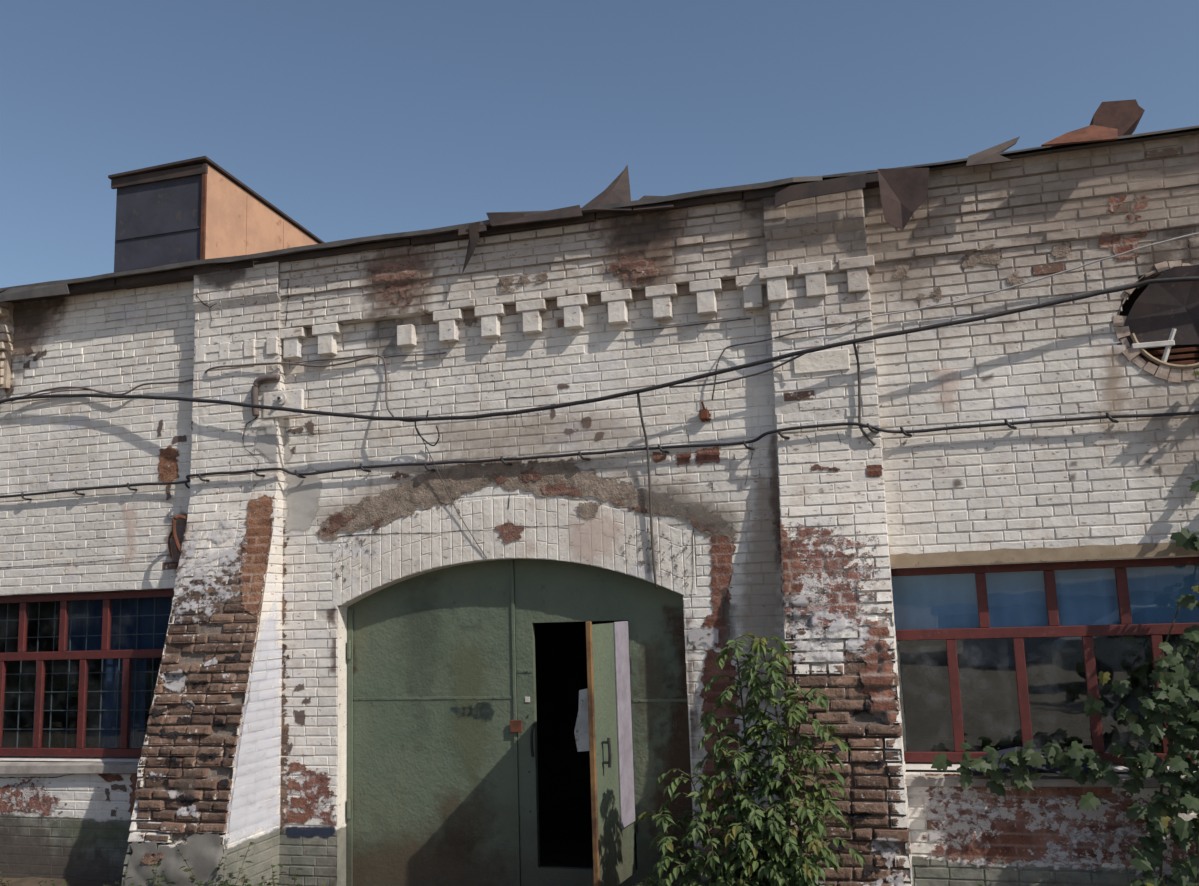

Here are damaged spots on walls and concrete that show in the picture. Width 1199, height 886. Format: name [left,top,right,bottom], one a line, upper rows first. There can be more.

damp [366,246,432,323]
damp [593,211,686,286]
flaking render [157,419,193,500]
flaking render [652,446,736,466]
rust [167,513,187,585]
flaking render [98,494,337,865]
spalling [316,456,742,872]
flaking render [772,512,1199,886]
flaking render [0,778,67,821]